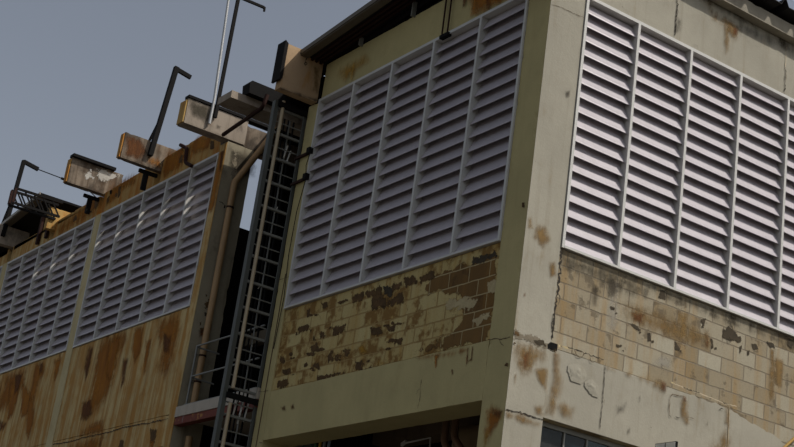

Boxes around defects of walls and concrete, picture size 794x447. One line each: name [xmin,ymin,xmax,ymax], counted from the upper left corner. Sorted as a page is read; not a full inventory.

corrosion [463,0,501,13]
spalling [59,169,135,234]
corrosion [126,137,145,158]
corrosion [152,136,224,211]
damp [530,220,549,245]
corrosion [0,363,44,438]
corrosion [76,316,178,447]
peeling [277,352,295,389]
peeling [295,302,371,381]
peeling [337,250,497,352]
damp [631,308,717,343]
damp [722,316,742,343]